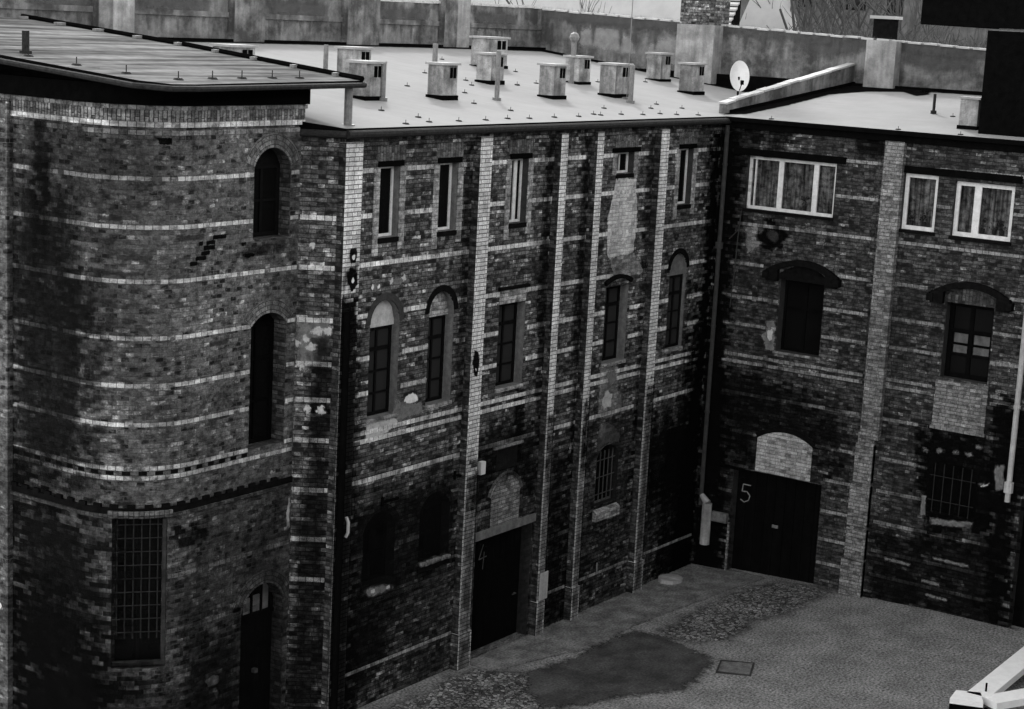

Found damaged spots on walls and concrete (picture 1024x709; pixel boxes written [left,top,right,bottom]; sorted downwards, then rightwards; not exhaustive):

peeling [607,178,643,281]
spalling [295,316,332,375]
peeling [761,320,775,351]